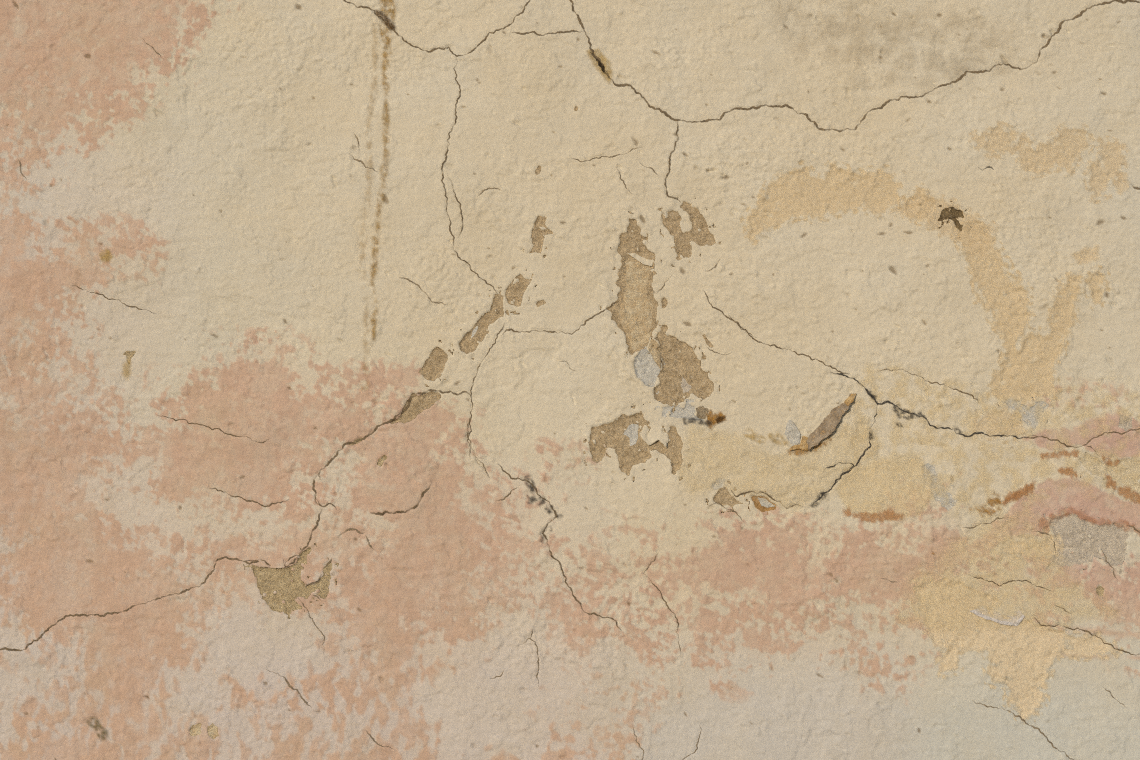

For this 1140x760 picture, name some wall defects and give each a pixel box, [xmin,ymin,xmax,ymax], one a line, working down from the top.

corrosion [376,0,395,84]
crack [344,0,1140,290]
peeling [523,216,553,258]
peeling [391,269,546,424]
peeling [583,198,721,481]
peeling [785,393,857,451]
crack [705,264,1140,518]
crack [0,302,619,651]
peeling [706,478,781,515]
spalling [243,543,339,619]
crack [974,577,1134,655]
crack [980,703,1073,760]